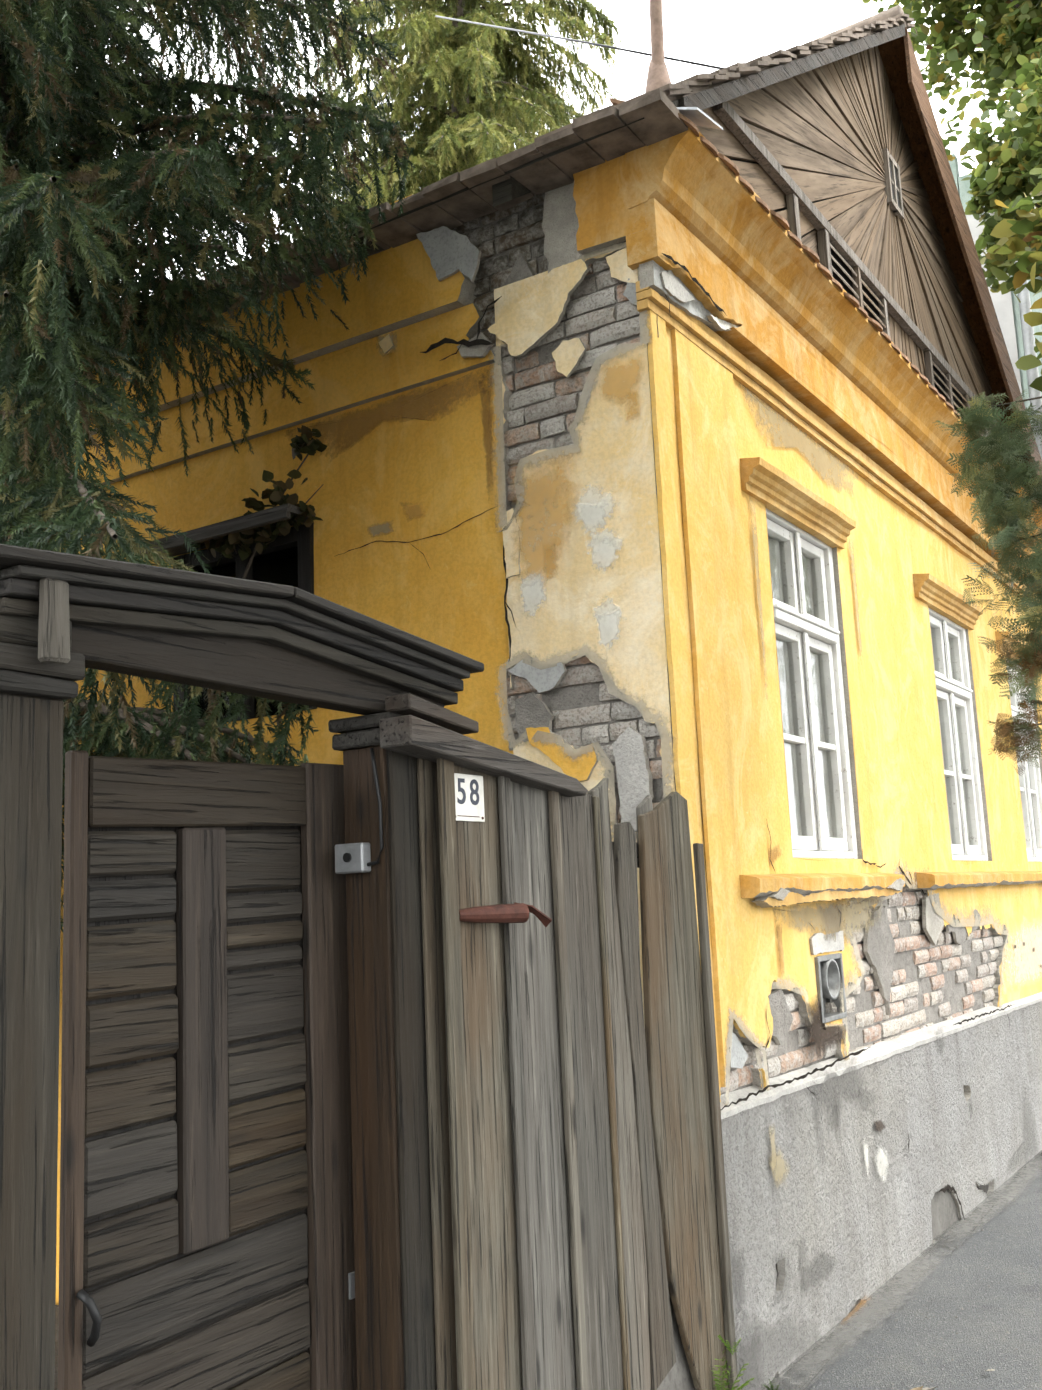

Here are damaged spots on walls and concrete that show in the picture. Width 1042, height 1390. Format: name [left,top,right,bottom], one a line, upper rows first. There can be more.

spalling [416,181,659,532]
peeling [660,271,695,303]
peeling [706,315,739,331]
spalling [496,646,672,840]
spalling [720,866,1042,1105]
spalling [931,1184,964,1240]